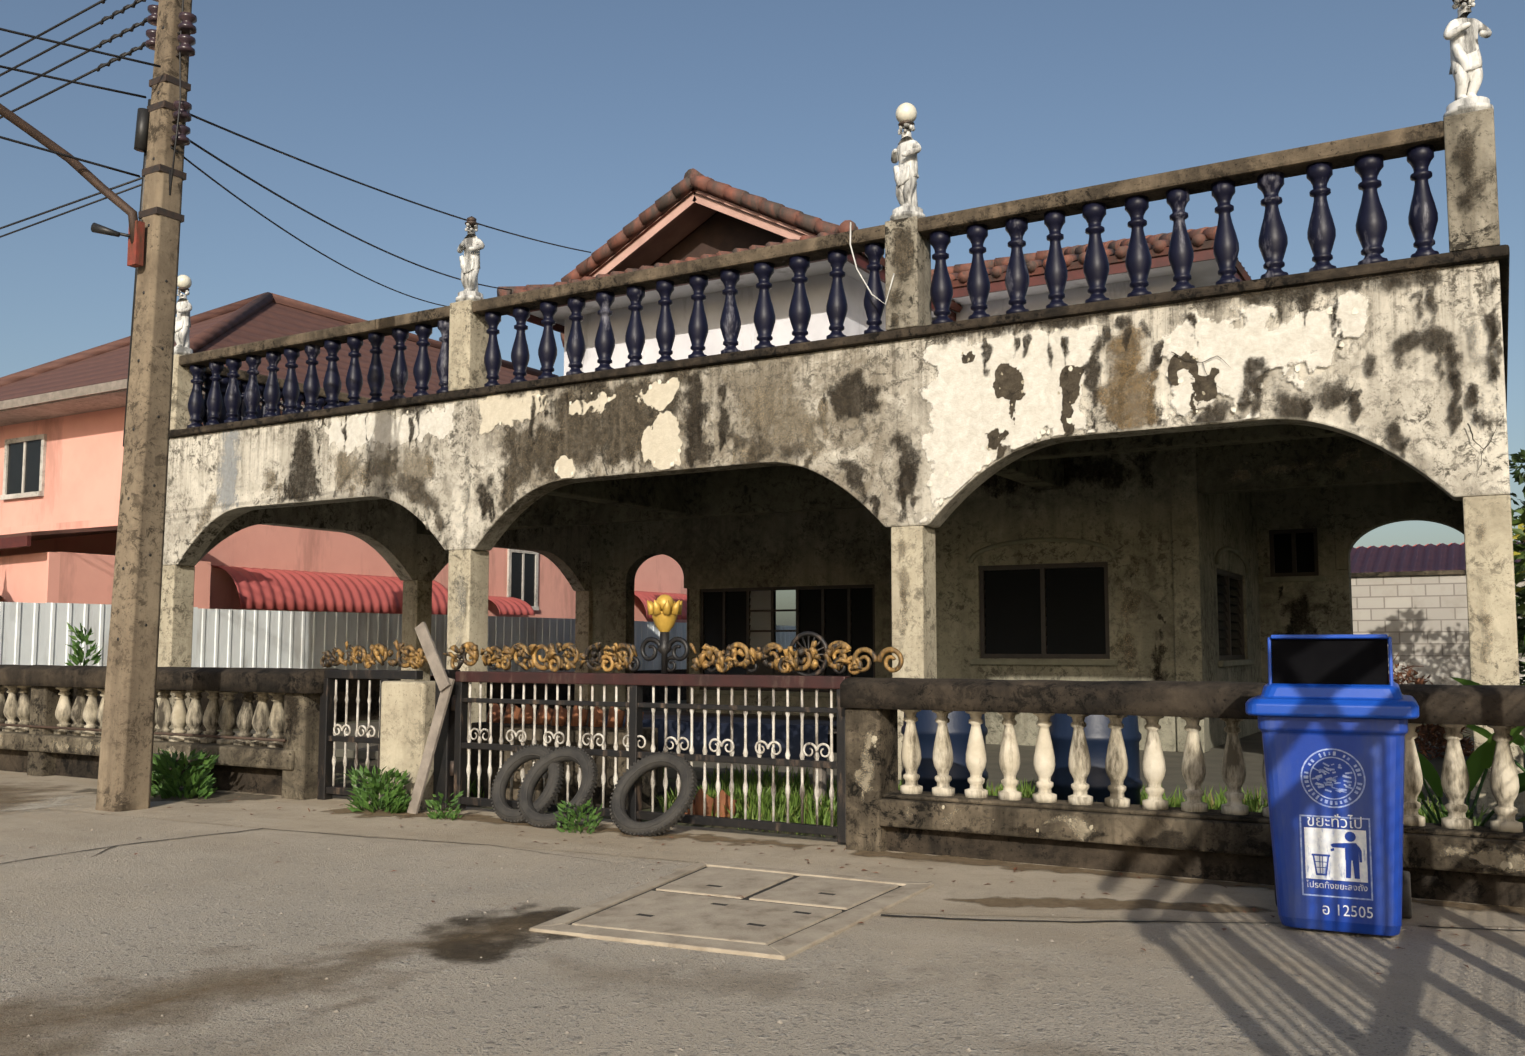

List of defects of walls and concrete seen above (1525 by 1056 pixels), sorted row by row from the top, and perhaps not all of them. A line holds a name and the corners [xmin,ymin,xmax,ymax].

peeling [478,390,547,435]
water stain [265,368,881,545]
peeling [569,391,616,415]
peeling [635,377,682,470]
water stain [838,433,920,522]
peeling [919,324,1099,523]
water stain [931,312,1164,431]
peeling [1160,289,1369,422]
water stain [1176,267,1505,434]
water stain [899,540,909,634]
water stain [356,905,575,962]
water stain [0,969,328,1056]